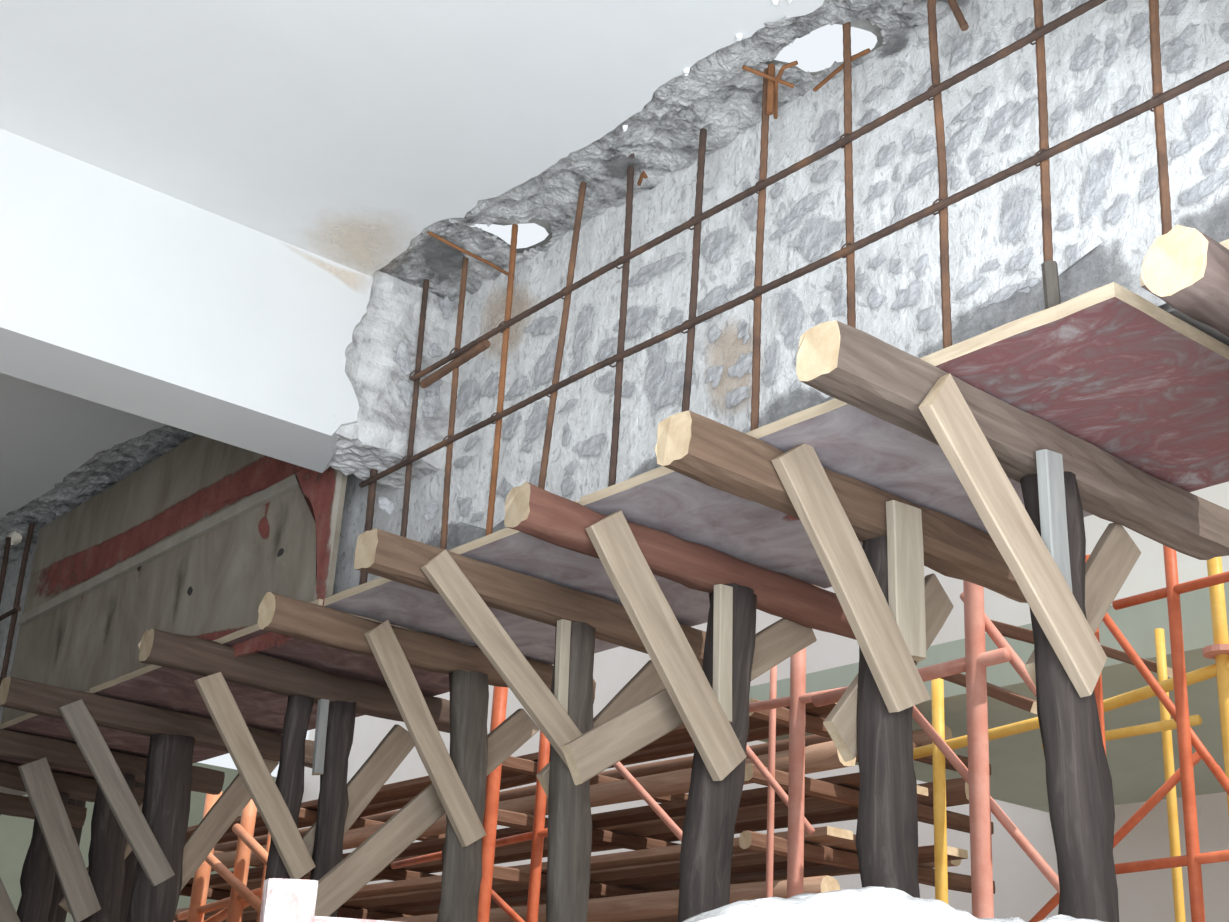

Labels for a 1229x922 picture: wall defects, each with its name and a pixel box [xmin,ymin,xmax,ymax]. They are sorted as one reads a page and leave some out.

rust [492,296,527,342]
spalling [329,0,1229,550]
spalling [0,425,196,685]